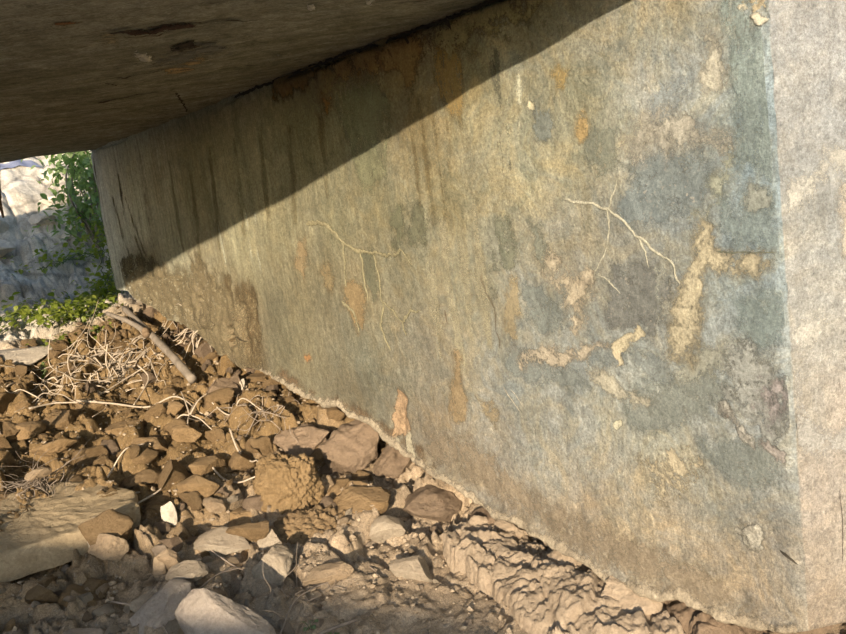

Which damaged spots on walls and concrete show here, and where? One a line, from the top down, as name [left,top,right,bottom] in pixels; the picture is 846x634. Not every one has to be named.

corrosion [111,20,255,38]
spalling [737,0,769,26]
water stain [112,175,263,370]
crack [305,219,420,350]
peeling [542,250,595,335]
crack [565,181,680,294]
peeling [621,105,790,463]
peeling [518,325,651,407]
spalling [260,368,608,583]
peeling [637,449,704,507]
peeling [735,524,764,552]
spalling [618,580,798,634]